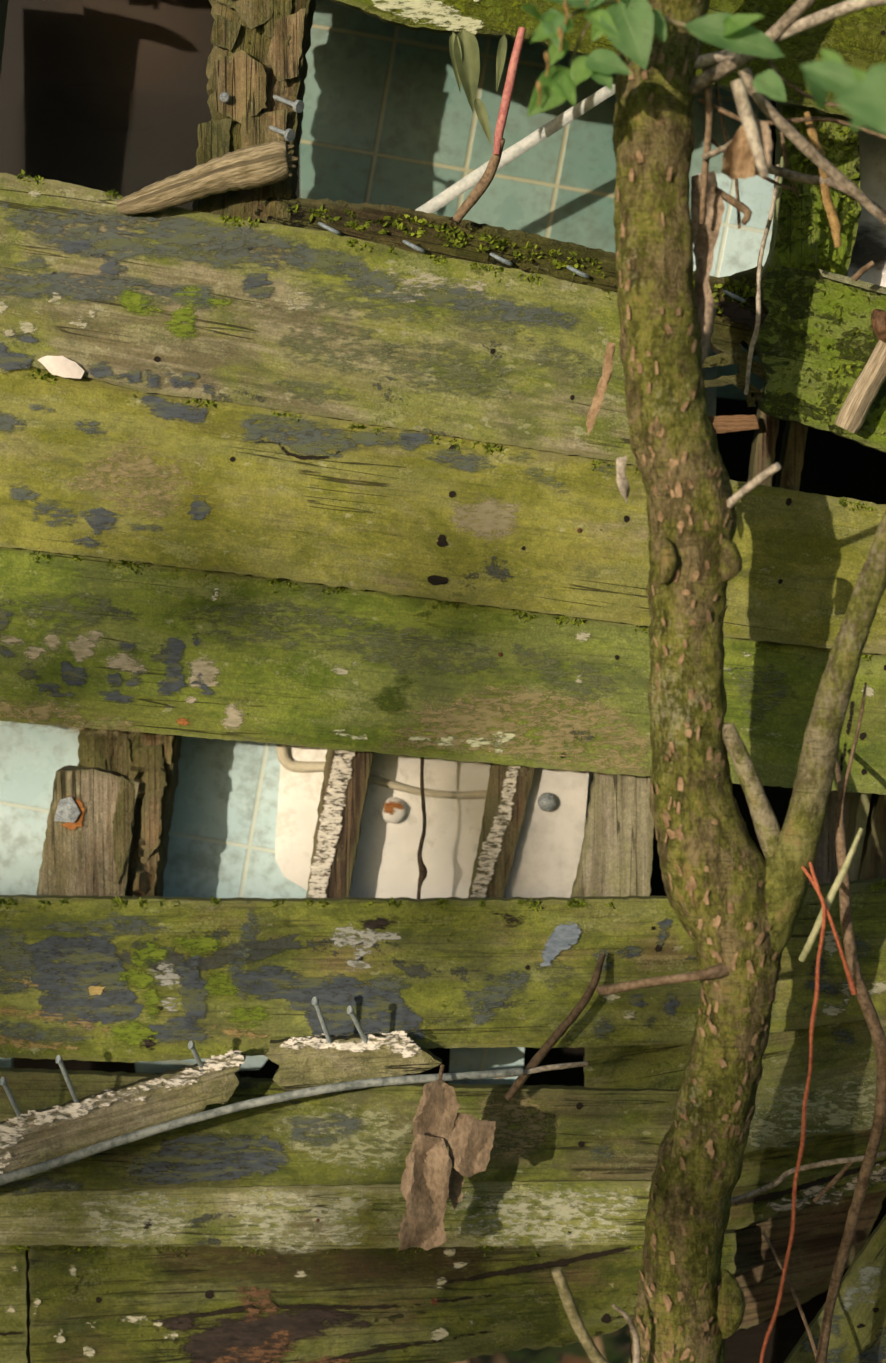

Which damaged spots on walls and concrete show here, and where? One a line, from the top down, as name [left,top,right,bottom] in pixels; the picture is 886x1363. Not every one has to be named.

rust [61,796,85,830]
rust [383,801,403,815]